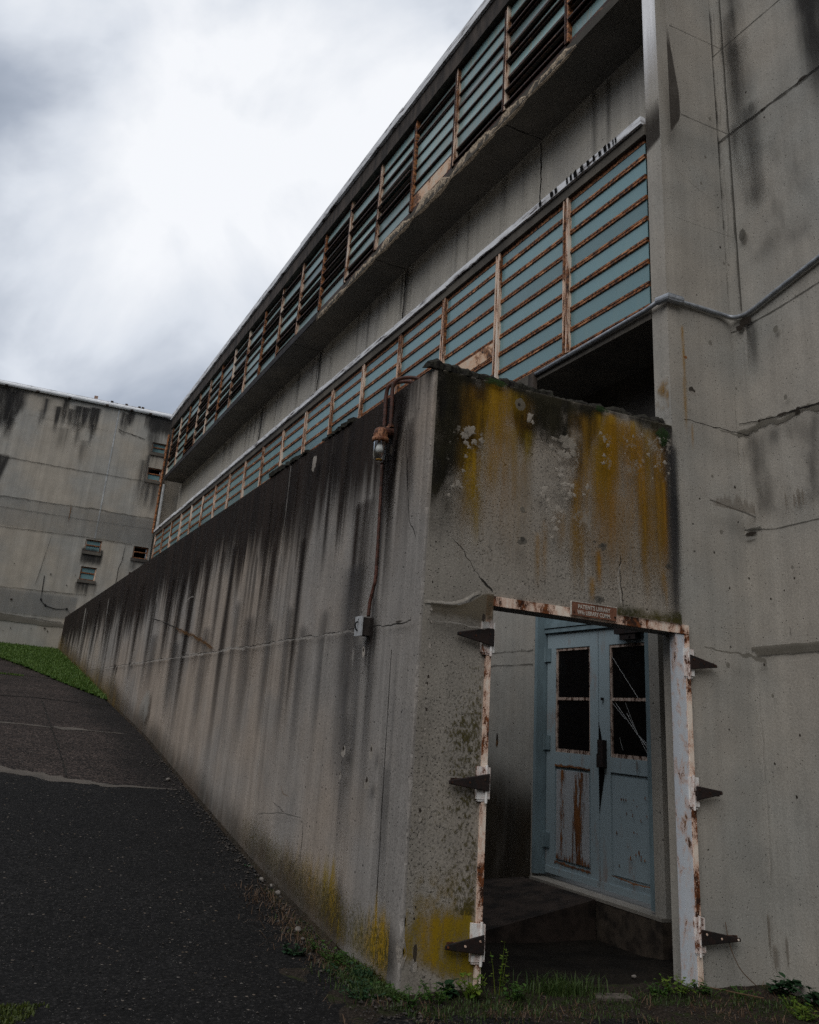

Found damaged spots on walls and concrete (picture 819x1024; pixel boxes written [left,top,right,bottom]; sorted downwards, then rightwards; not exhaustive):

leakage [796,0,819,79]
leakage [646,35,680,150]
crack [719,65,819,143]
leakage [0,387,26,430]
leakage [43,398,100,433]
crack [684,402,819,438]
leakage [576,412,678,609]
leakage [58,371,453,810]
crack [453,539,493,592]
corrosion [554,764,591,874]
leakage [404,908,473,979]